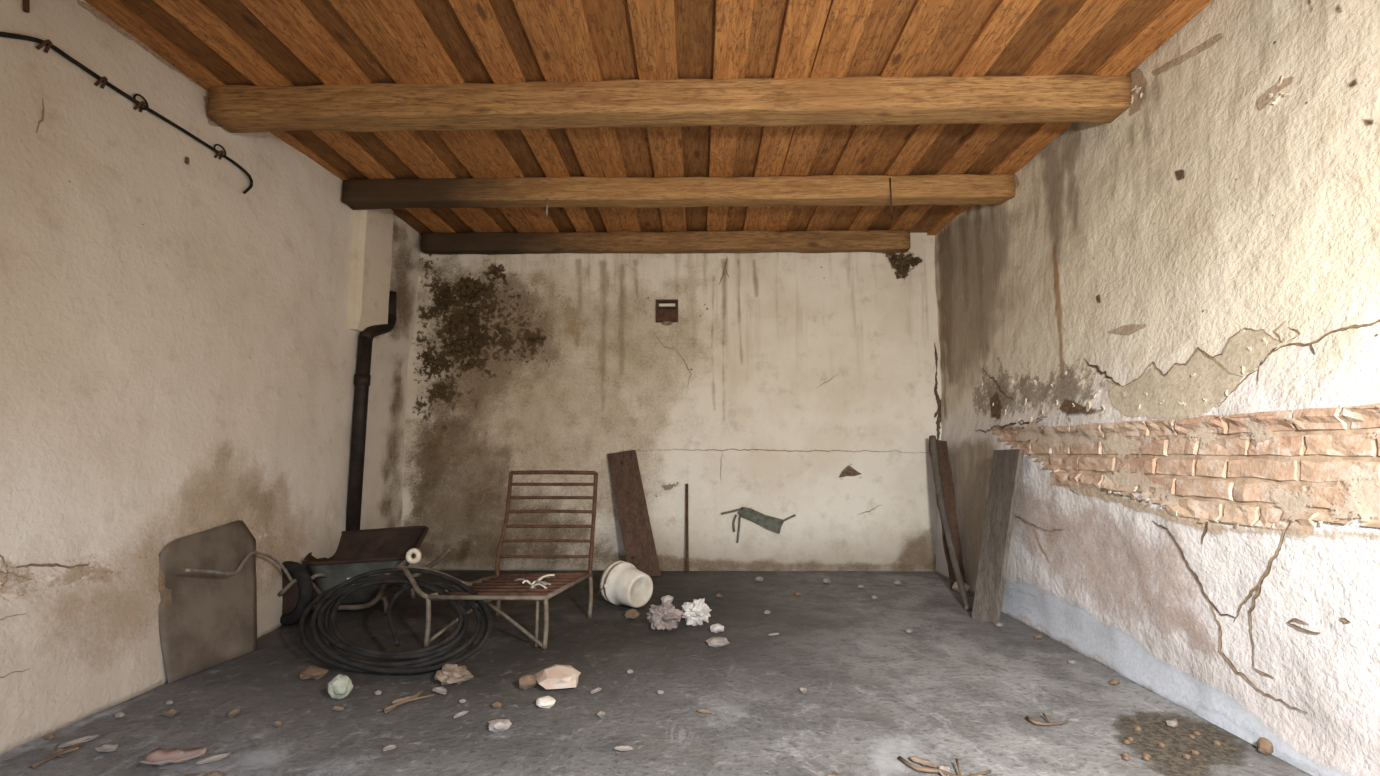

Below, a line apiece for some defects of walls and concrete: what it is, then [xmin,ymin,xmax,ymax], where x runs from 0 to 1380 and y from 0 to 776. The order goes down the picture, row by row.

leakage [1046,130,1077,247]
leakage [939,205,1004,382]
crack [1257,319,1380,380]
leakage [382,254,590,567]
flaking render [973,328,1380,538]
crack [0,555,89,620]
flaking render [0,557,119,601]
crack [1153,520,1307,713]
crack [1287,618,1351,634]